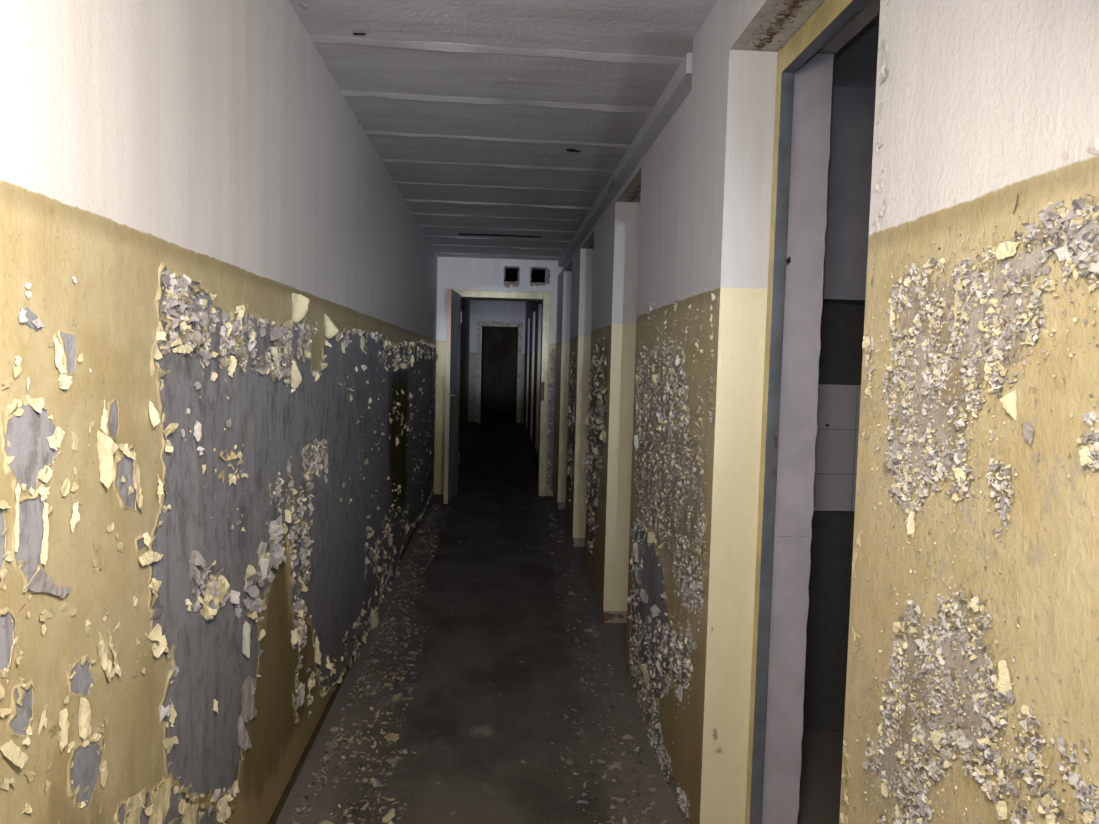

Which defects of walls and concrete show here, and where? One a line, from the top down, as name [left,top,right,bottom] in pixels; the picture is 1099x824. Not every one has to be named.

peeling [18,283,77,389]
peeling [0,377,72,598]
peeling [70,502,80,533]
peeling [97,398,144,512]
peeling [113,261,438,824]
peeling [0,606,19,676]
peeling [626,520,673,702]
peeling [0,678,35,769]
peeling [59,629,122,813]